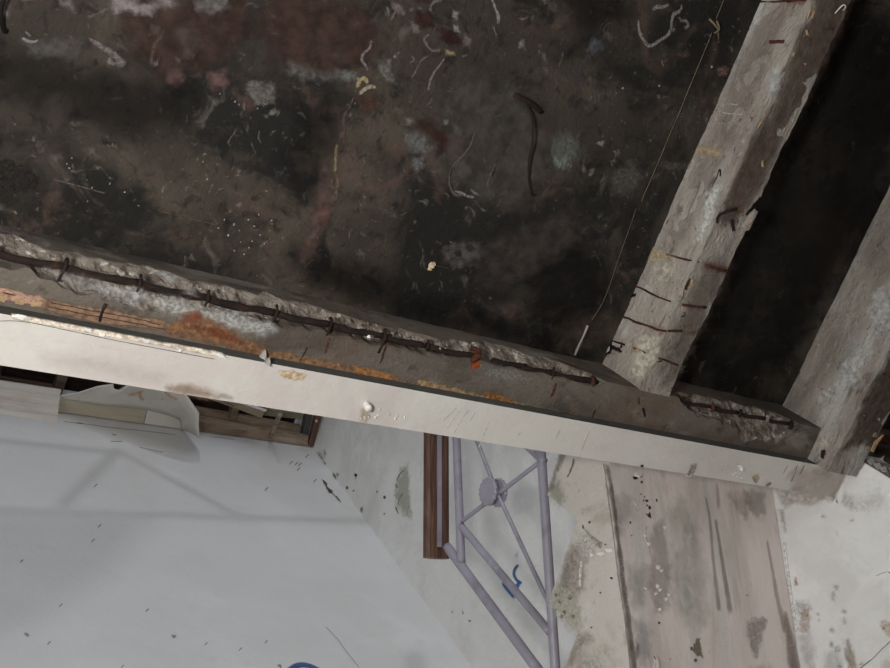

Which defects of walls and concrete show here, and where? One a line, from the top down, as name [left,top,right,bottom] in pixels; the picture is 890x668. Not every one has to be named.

corrosion [666,254,726,272]
corrosion [0,288,538,408]
spalling [0,234,604,387]
corrosion [622,316,695,335]
corrosion [635,278,707,309]
spalling [678,393,798,444]